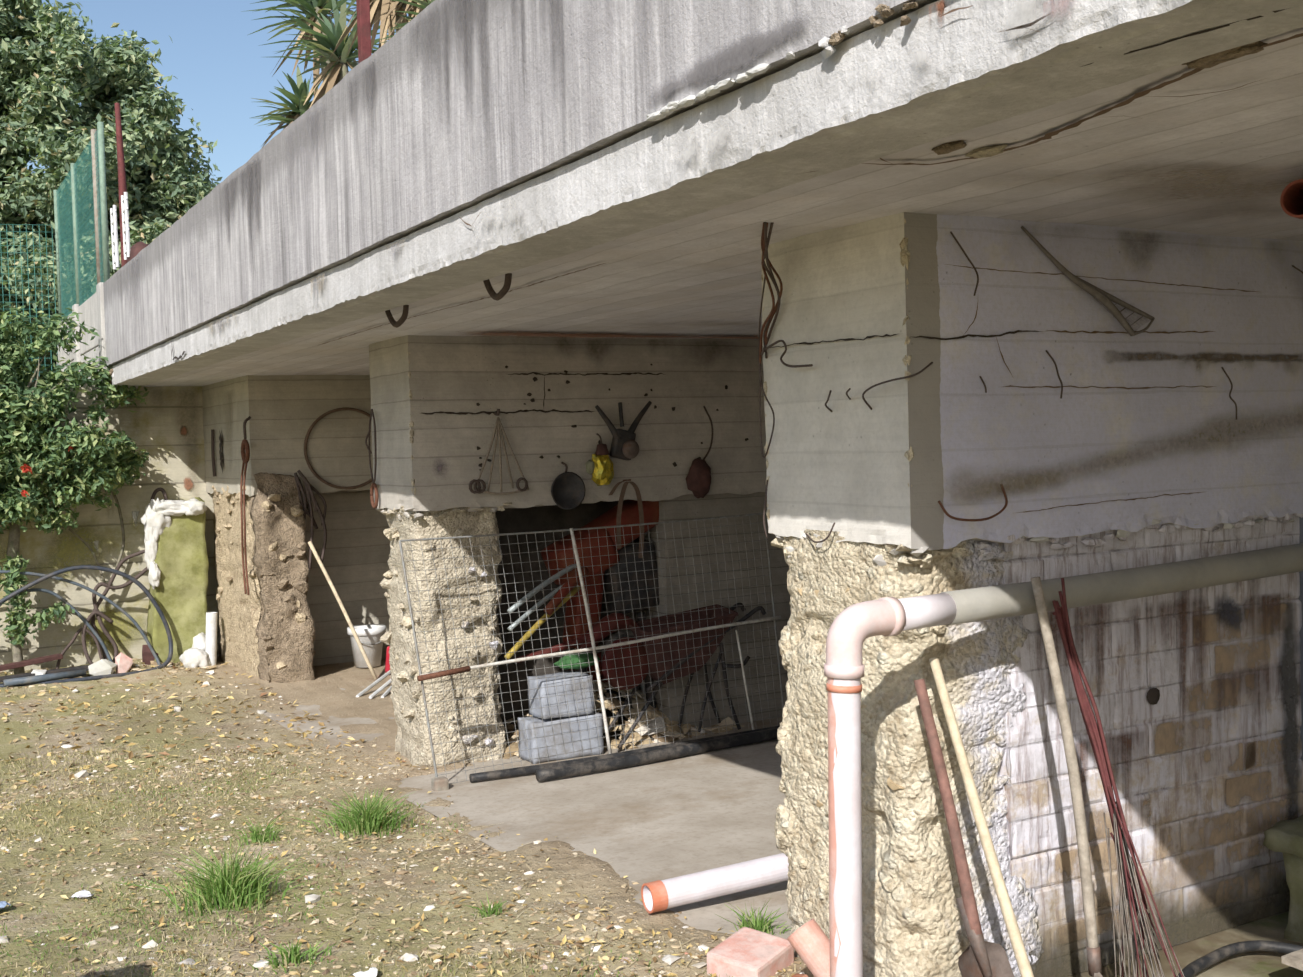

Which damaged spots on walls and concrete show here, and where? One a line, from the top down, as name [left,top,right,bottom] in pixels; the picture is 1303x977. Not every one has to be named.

spalling [818,25,851,59]
flaking render [646,51,795,121]
crack [862,8,1303,165]
crack [945,264,1257,292]
crack [762,303,1215,389]
water stain [1122,353,1301,368]
spalling [212,472,316,683]
spalling [771,535,823,558]
spalling [873,513,1303,568]
spalling [380,570,423,718]
water stain [1216,599,1243,630]
water stain [1280,609,1300,820]